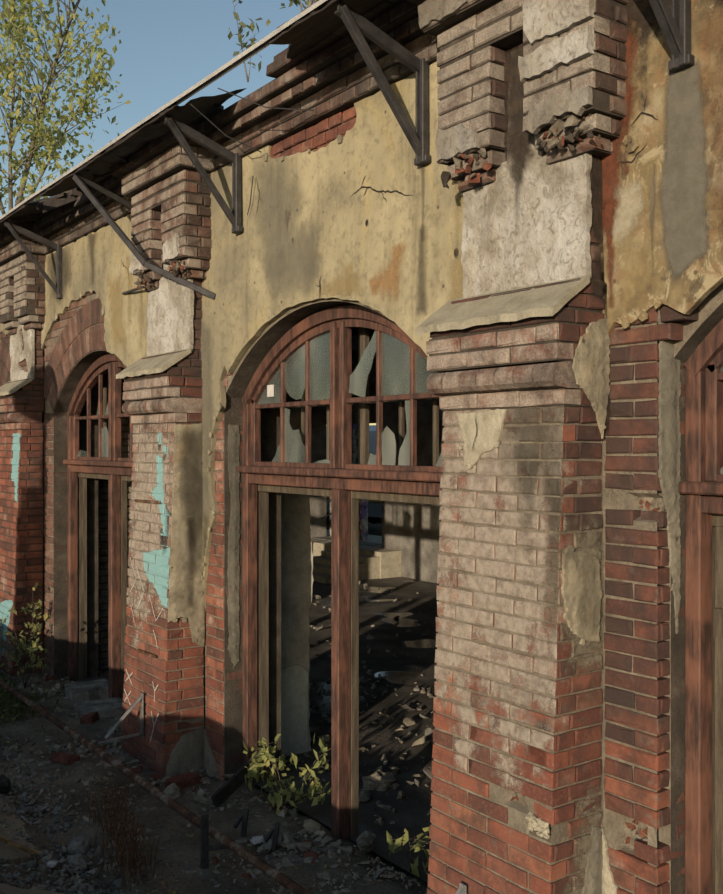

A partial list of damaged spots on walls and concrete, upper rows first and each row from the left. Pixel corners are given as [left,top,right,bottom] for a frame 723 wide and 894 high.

damp [625,0,660,45]
flaking render [262,106,357,162]
crack [352,175,408,202]
peeling [639,341,681,634]
peeling [227,424,240,666]
spalling [511,791,550,839]
spalling [625,818,648,844]